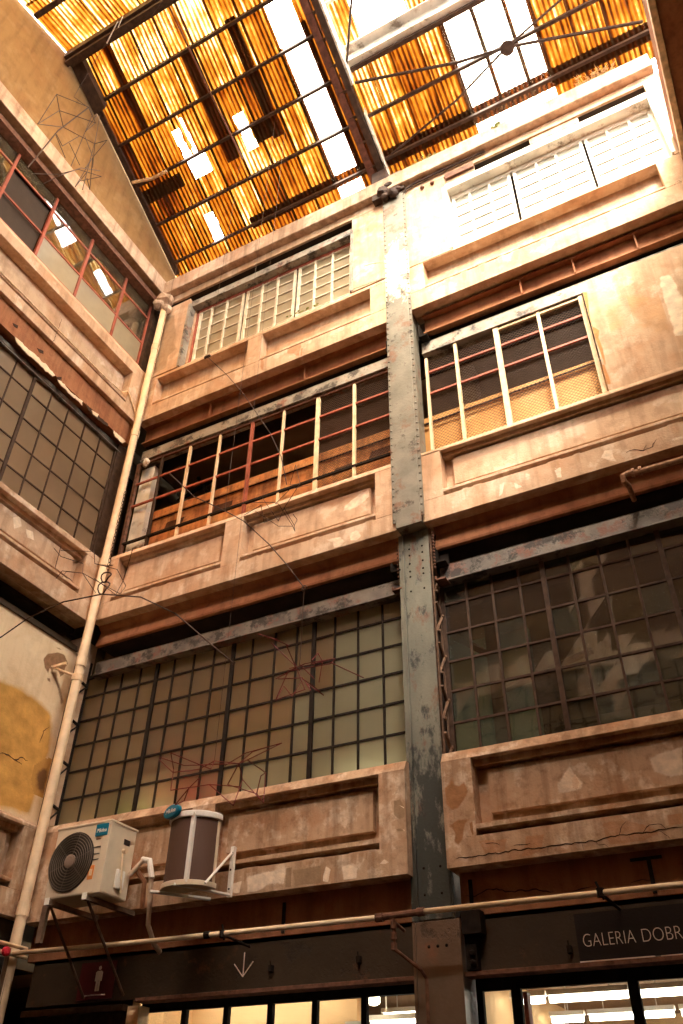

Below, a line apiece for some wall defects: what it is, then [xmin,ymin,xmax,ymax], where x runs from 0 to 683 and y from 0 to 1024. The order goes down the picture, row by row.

damp [0,670,58,823]
crack [456,824,679,859]